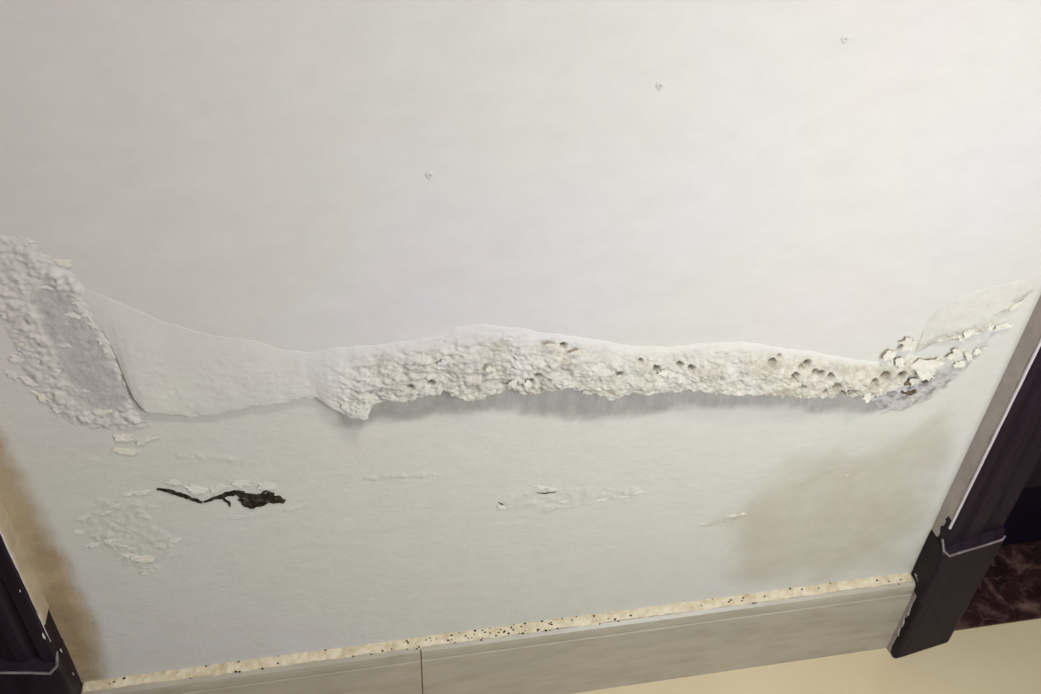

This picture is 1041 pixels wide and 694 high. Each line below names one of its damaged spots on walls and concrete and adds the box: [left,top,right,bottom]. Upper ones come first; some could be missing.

crack [157,479,308,520]